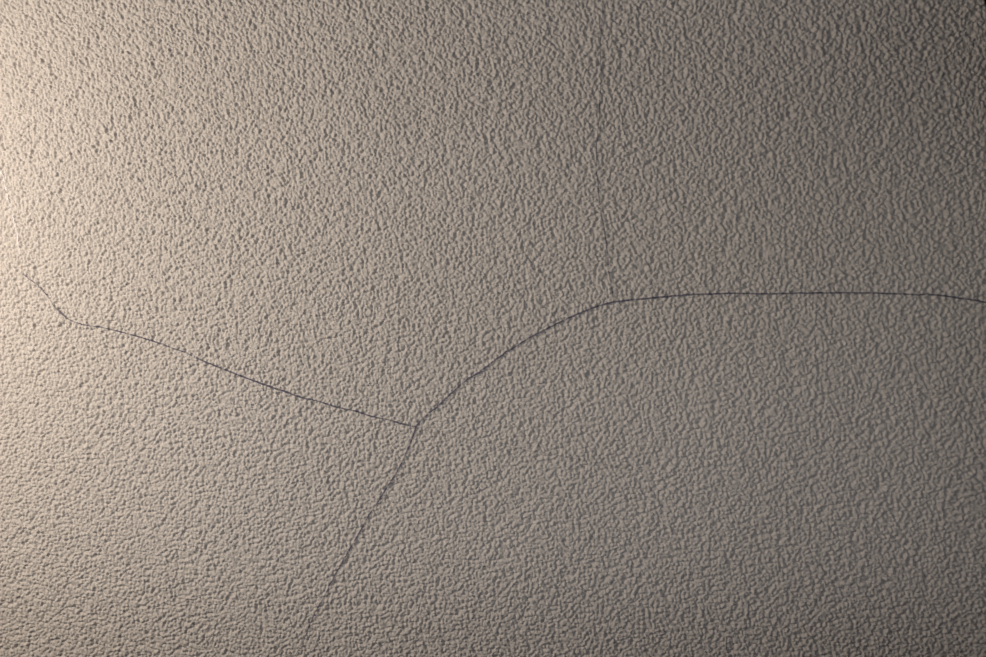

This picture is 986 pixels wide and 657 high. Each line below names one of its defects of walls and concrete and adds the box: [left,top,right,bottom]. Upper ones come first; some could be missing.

crack [596,0,604,200]
crack [23,211,986,657]